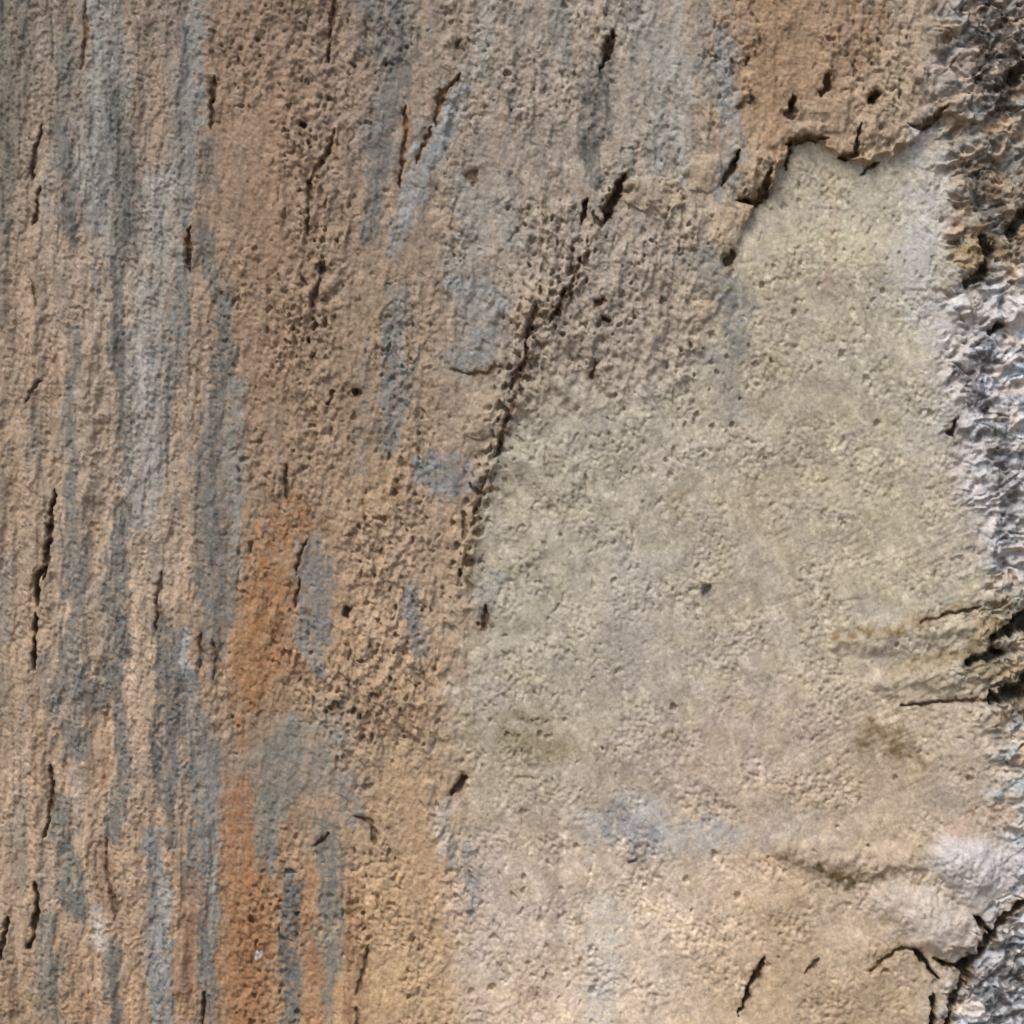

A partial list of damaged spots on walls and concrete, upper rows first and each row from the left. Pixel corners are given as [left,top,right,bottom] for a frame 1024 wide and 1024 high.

peeling [407,110,440,167]
crack [395,71,466,189]
crack [578,168,636,230]
spalling [912,0,1024,240]
crack [454,254,588,587]
crack [27,487,63,673]
rust [224,459,405,755]
spalling [437,67,1024,1024]
crack [0,879,46,963]
rust [170,764,281,1024]
crack [733,953,768,1017]
crack [867,897,1024,1024]